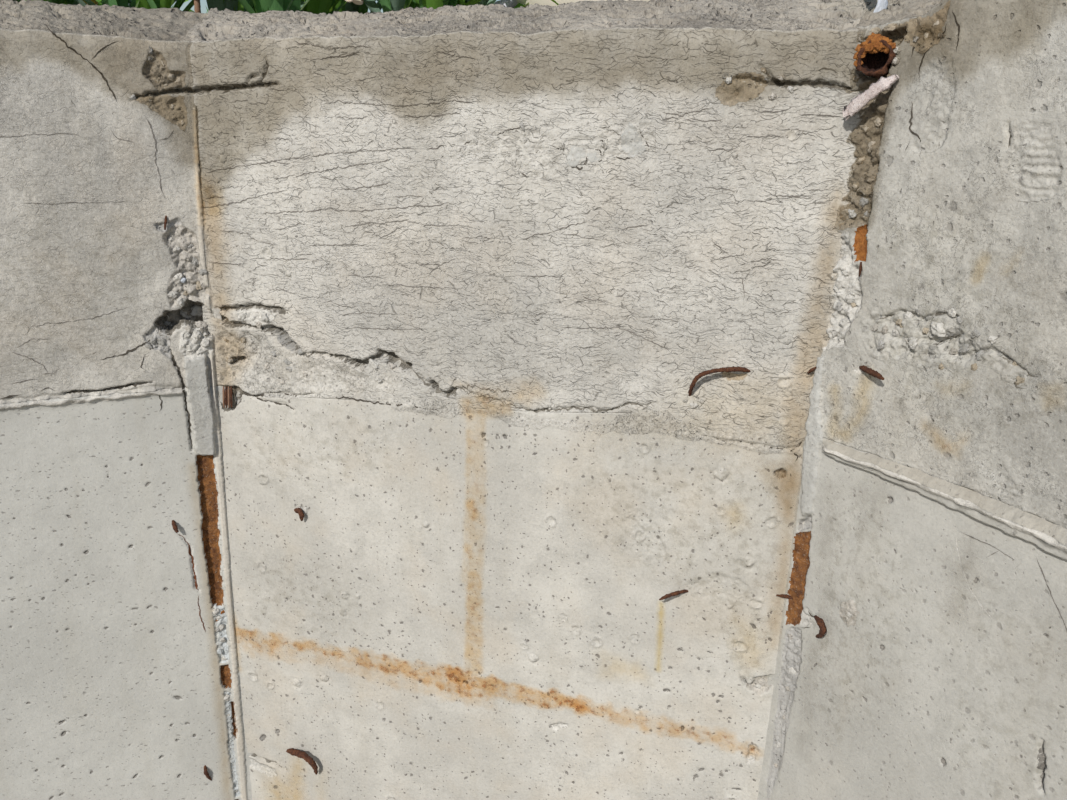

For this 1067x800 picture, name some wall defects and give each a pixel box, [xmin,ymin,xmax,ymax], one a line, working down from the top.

crack [43,23,288,193]
crack [294,41,481,119]
crack [512,108,724,188]
crack [707,67,852,151]
crack [203,125,527,289]
crack [522,221,598,240]
crack [666,241,782,297]
crack [702,178,830,206]
crack [1,307,192,444]
crack [219,289,656,413]
peeling [143,218,801,455]
crack [564,292,674,352]